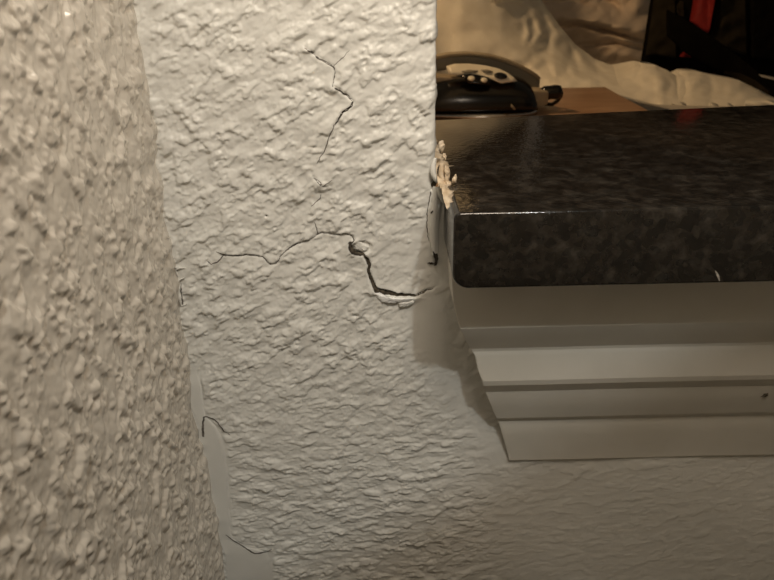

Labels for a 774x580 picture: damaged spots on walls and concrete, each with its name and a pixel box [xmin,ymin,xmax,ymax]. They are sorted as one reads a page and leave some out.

crack [208,48,433,307]
flaking render [430,134,457,209]